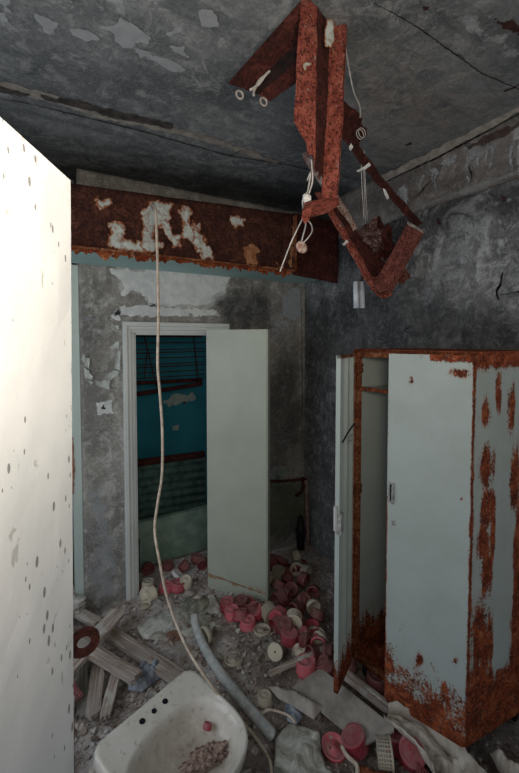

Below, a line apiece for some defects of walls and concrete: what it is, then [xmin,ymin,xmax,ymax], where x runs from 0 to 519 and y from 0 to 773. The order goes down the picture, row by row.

peeling [34,13,59,35]
peeling [69,0,189,72]
peeling [198,9,219,28]
crack [374,3,519,90]
crack [342,113,519,198]
efflorescence [398,141,496,222]
peeling [109,268,231,329]
rust [71,248,292,278]
crack [496,272,519,300]
peeling [82,341,121,389]
peeling [96,400,114,415]
peeling [163,392,196,407]